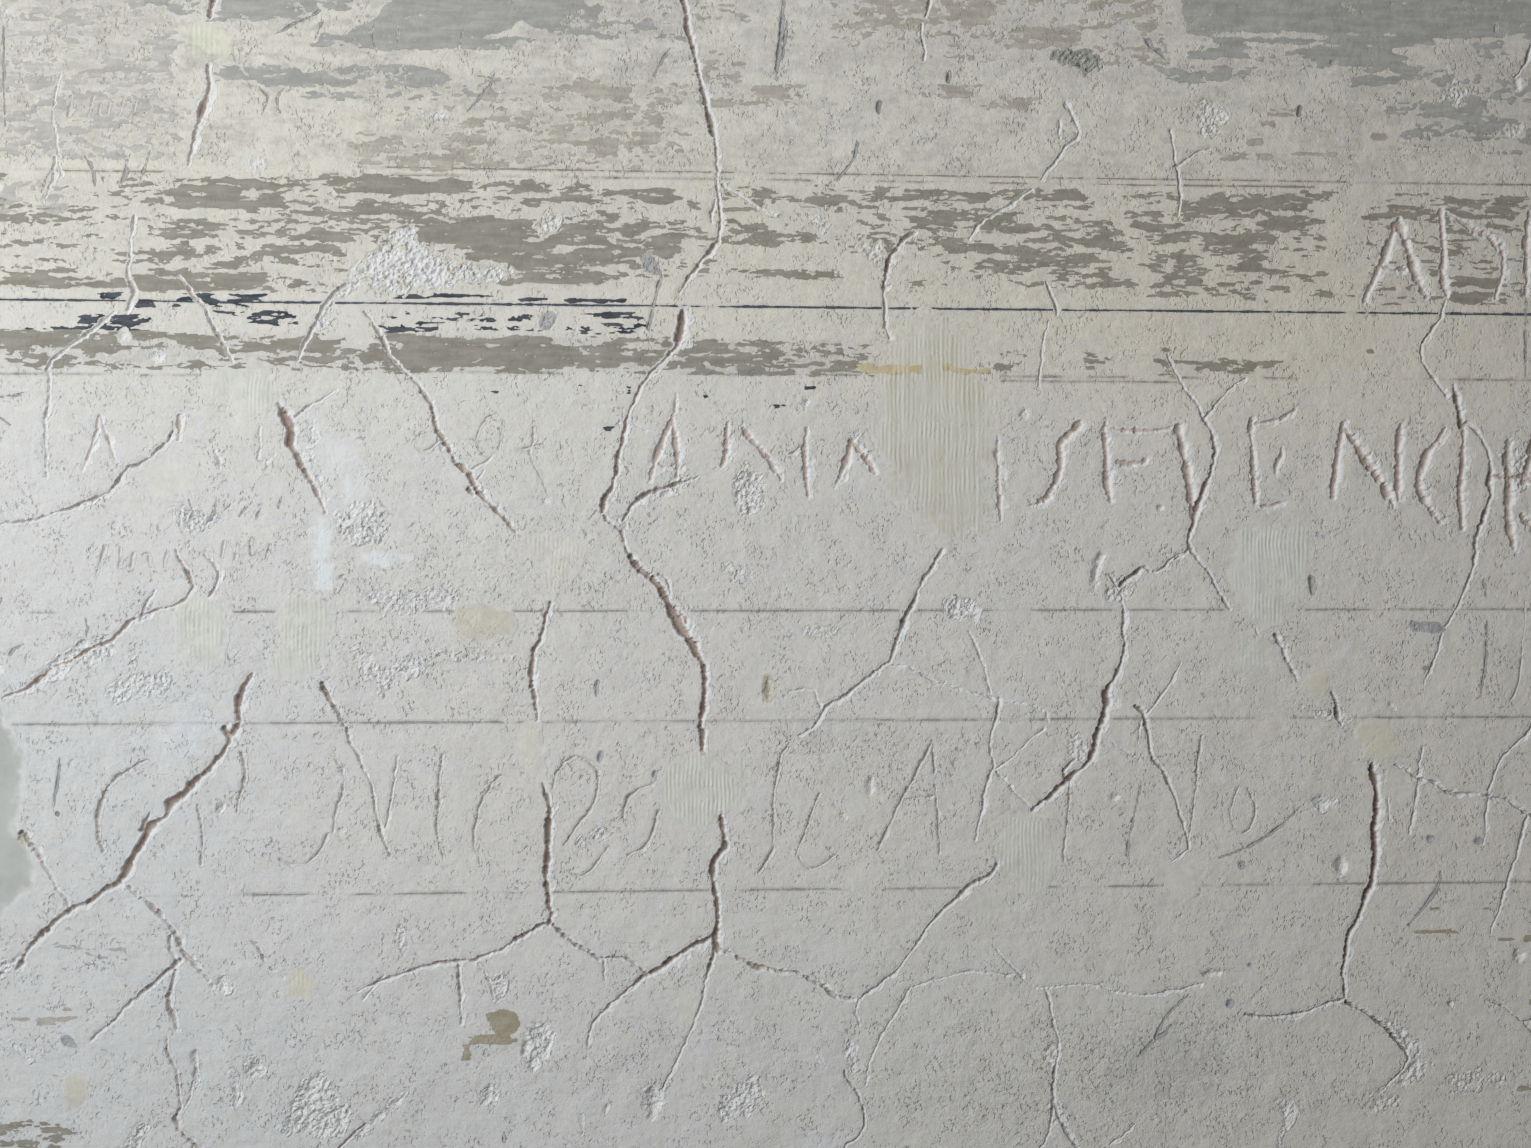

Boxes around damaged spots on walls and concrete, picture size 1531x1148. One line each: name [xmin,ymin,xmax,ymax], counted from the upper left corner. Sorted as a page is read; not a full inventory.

crack [0,213,176,527]
crack [1,547,225,700]
crack [13,671,256,1148]
crack [185,62,218,169]
crack [274,387,340,516]
crack [317,678,400,860]
crack [295,281,520,536]
crack [597,0,780,760]
peeling [0,0,1531,408]
crack [355,352,1345,1148]
crack [1242,721,1531,1088]
crack [1418,299,1501,687]